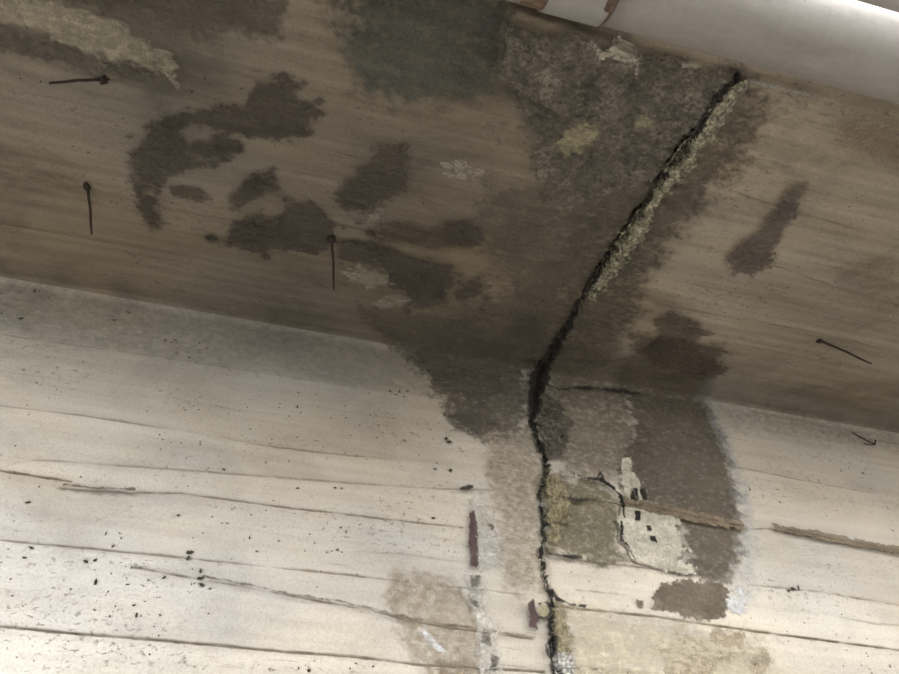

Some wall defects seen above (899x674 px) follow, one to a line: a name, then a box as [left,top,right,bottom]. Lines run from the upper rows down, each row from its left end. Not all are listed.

damp [126,71,325,230]
damp [726,186,807,277]
damp [204,66,768,674]
crack [202,71,813,674]
spalling [617,457,697,575]